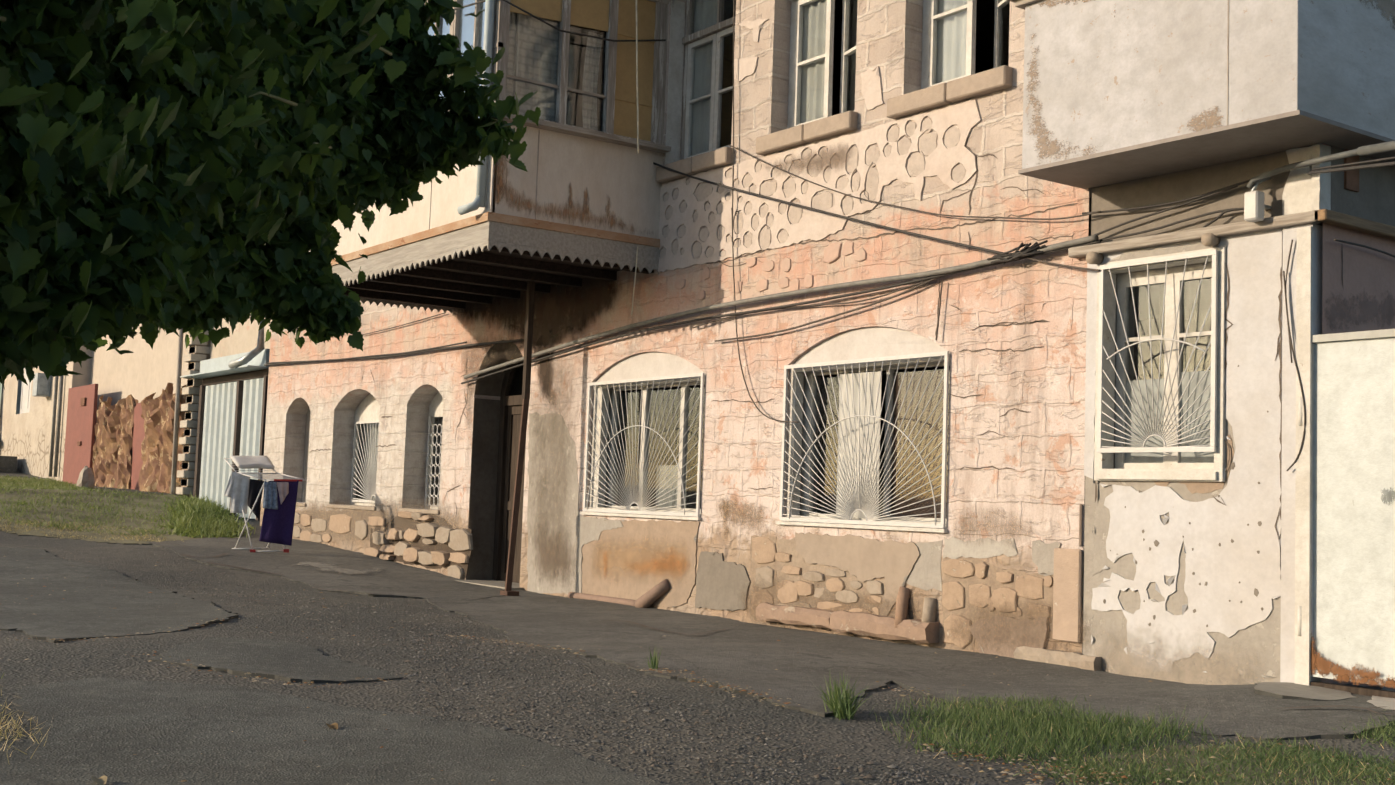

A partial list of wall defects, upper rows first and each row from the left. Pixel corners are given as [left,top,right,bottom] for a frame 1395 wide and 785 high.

peeling [1027,34,1093,164]
peeling [1091,505,1207,664]
peeling [1176,581,1281,678]
corrosion [1311,637,1395,689]